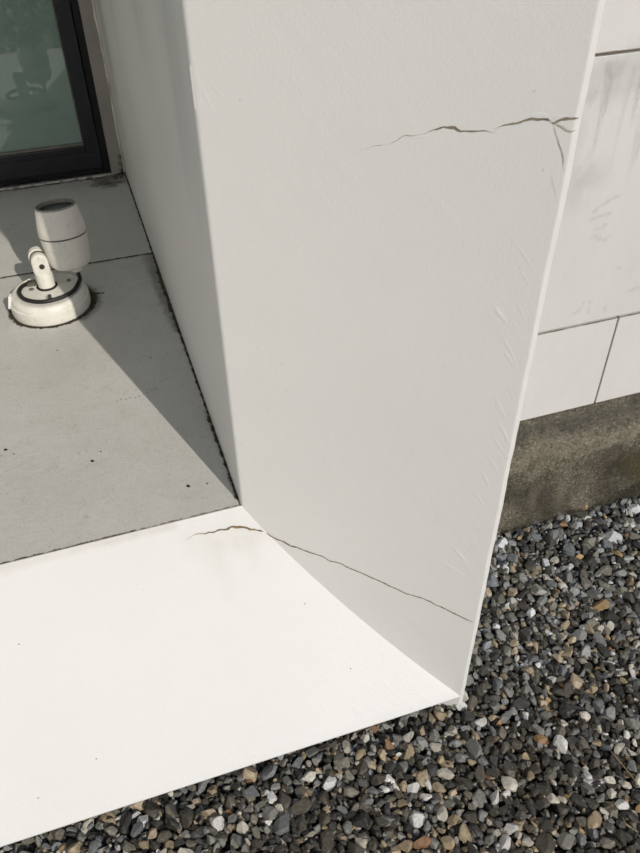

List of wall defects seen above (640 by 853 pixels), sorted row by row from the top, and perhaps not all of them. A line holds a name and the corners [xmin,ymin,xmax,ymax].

crack [364,112,578,202]
damp [538,312,640,335]
crack [191,526,472,622]